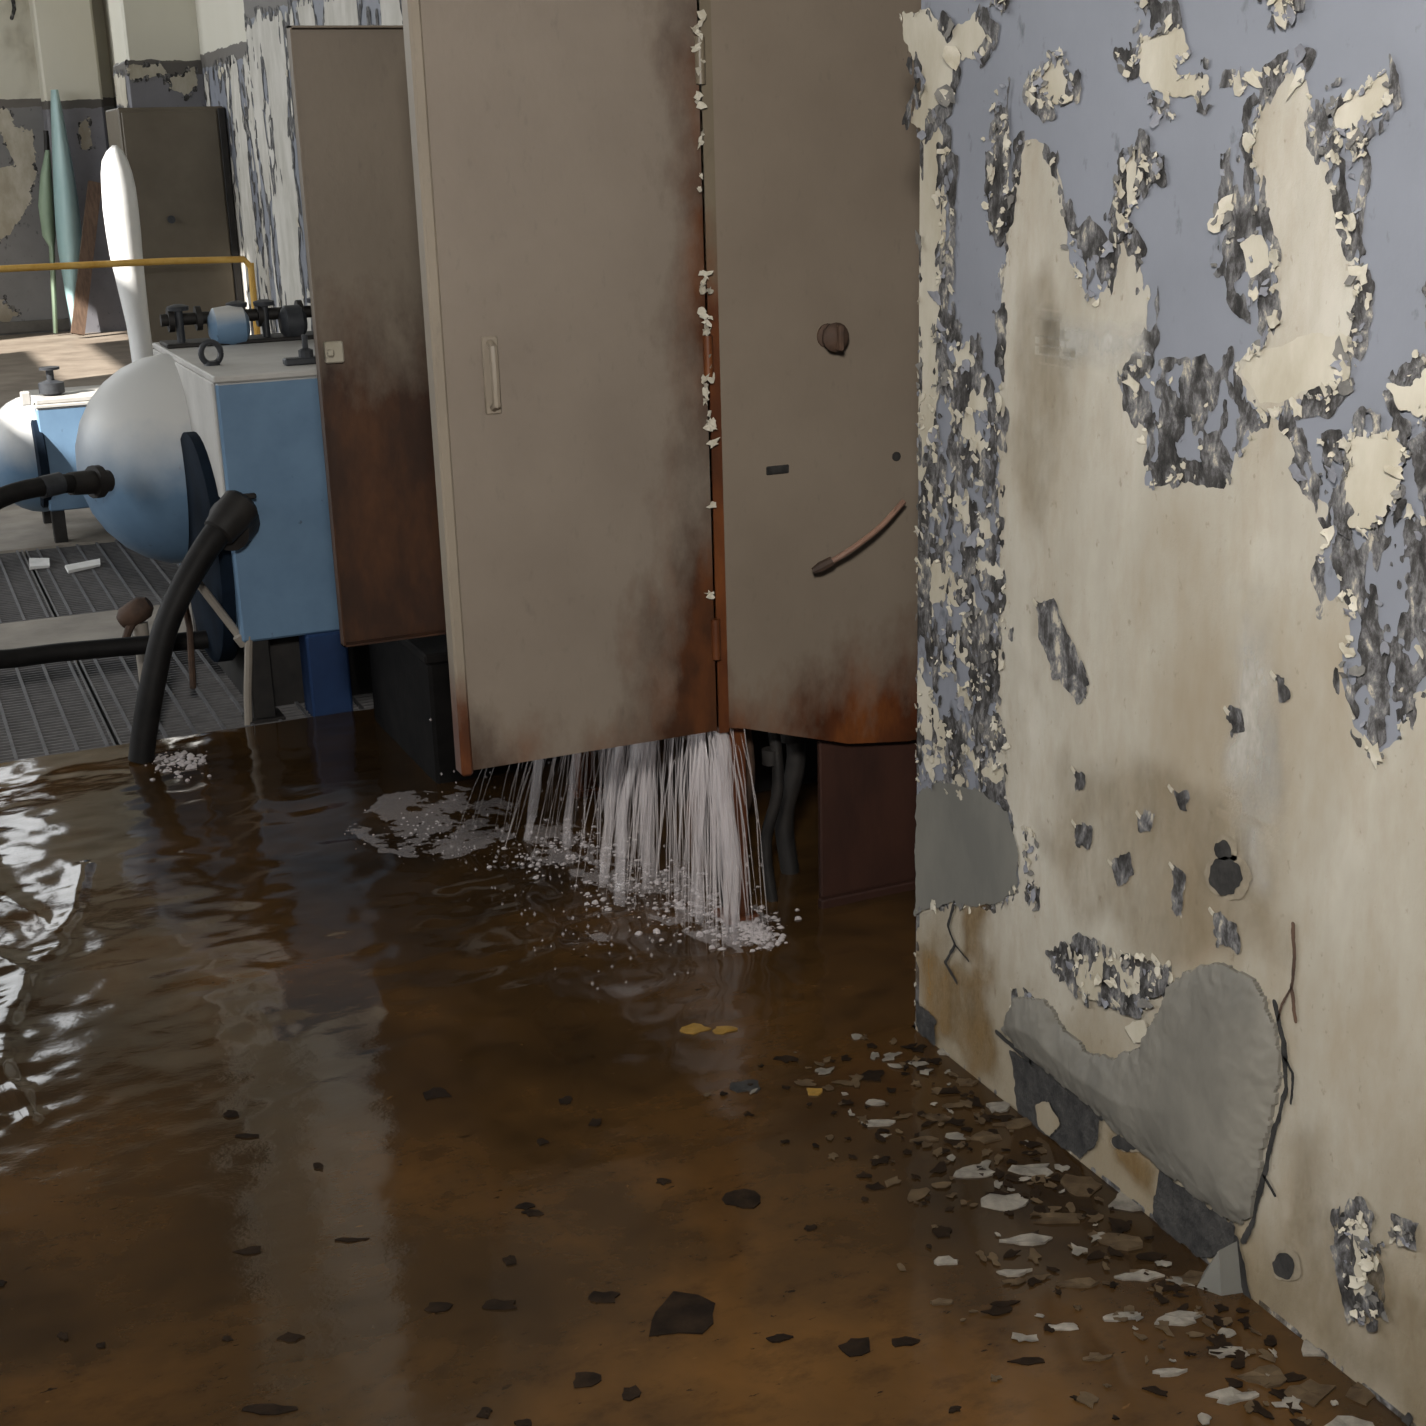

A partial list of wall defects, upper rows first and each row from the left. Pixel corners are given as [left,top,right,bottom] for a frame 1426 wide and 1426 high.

peeling [0,106,40,244]
peeling [113,0,403,335]
peeling [899,0,1426,1426]
crack [944,901,969,984]
crack [1233,922,1297,1300]